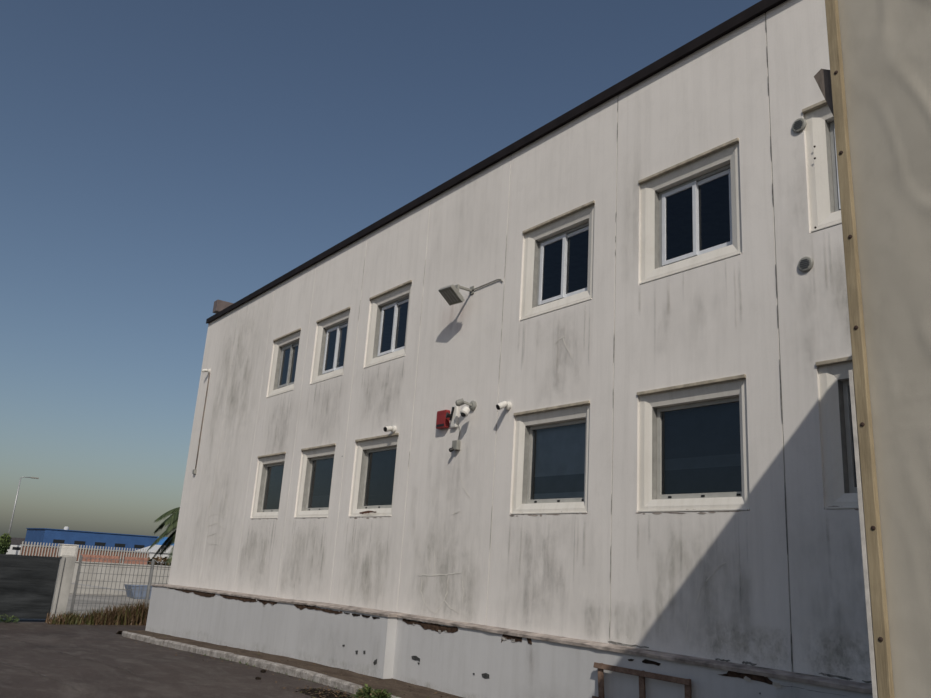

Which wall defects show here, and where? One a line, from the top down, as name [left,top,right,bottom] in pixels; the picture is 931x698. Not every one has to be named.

flaking render [294,604,380,619]
flaking render [402,619,458,633]
flaking render [501,634,532,644]
flaking render [718,671,782,689]